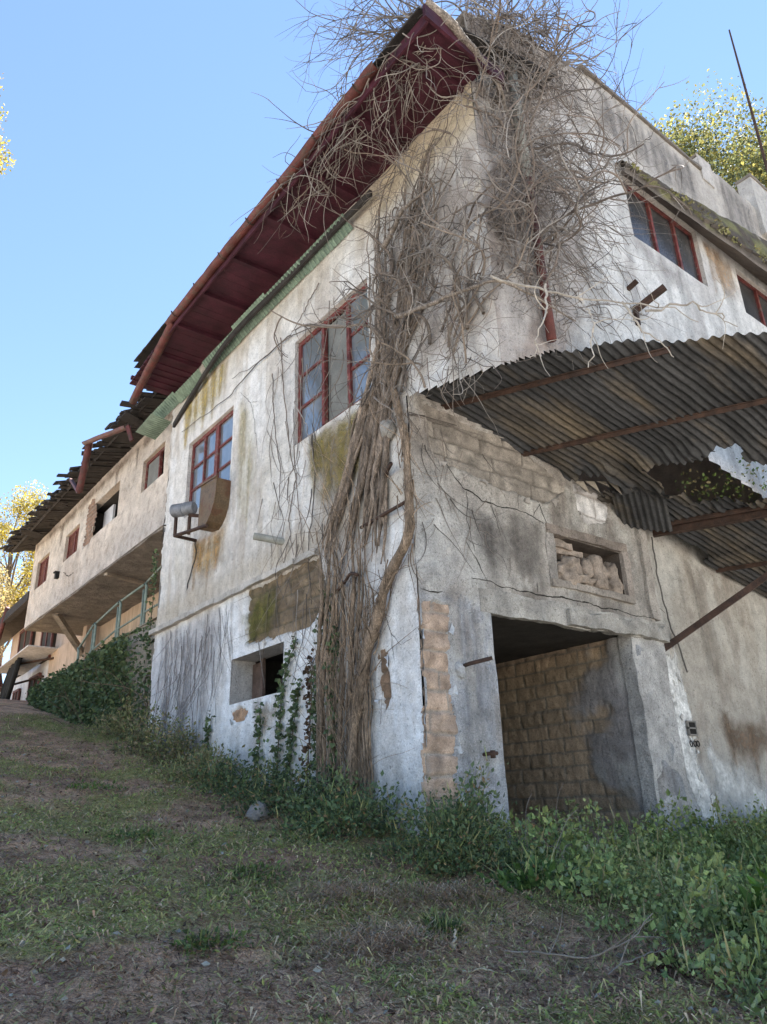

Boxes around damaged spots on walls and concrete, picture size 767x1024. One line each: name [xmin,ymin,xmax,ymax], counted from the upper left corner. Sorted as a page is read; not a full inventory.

leakage [184,366,223,445]
spalling [423,404,612,525]
crack [446,464,665,618]
spalling [245,558,326,646]
spalling [230,708,248,725]
peeling [374,646,392,710]
spalling [416,597,466,831]
leakage [724,714,767,756]